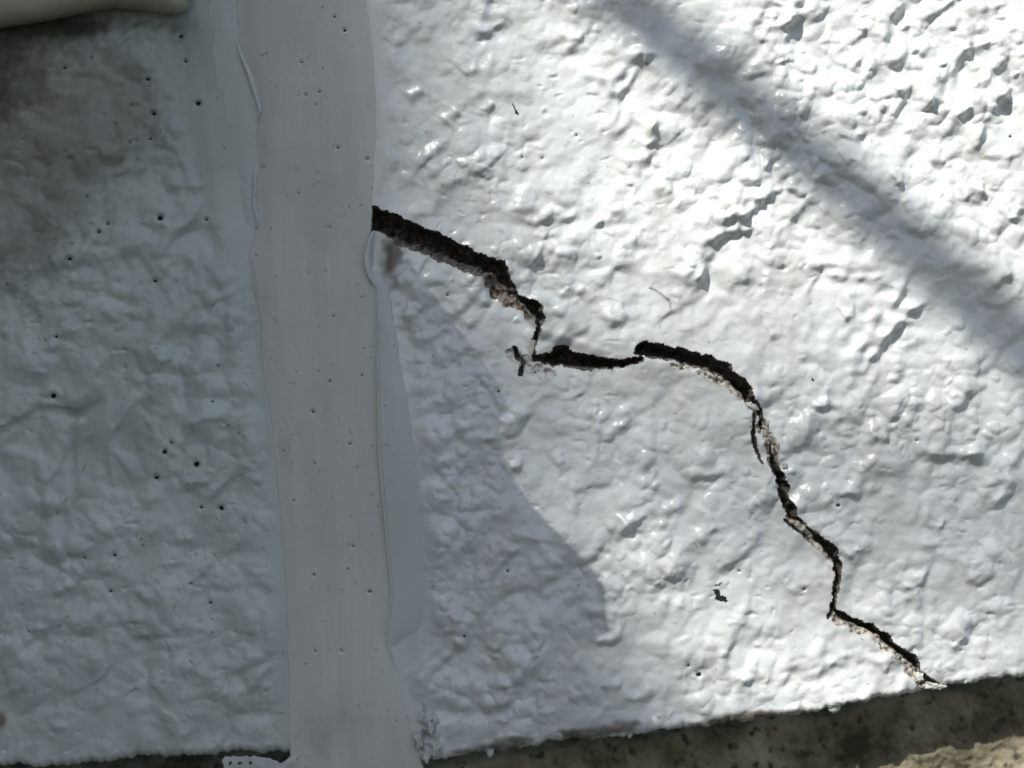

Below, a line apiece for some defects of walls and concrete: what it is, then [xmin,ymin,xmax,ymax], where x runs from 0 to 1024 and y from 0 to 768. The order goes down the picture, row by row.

crack [371,205,947,690]